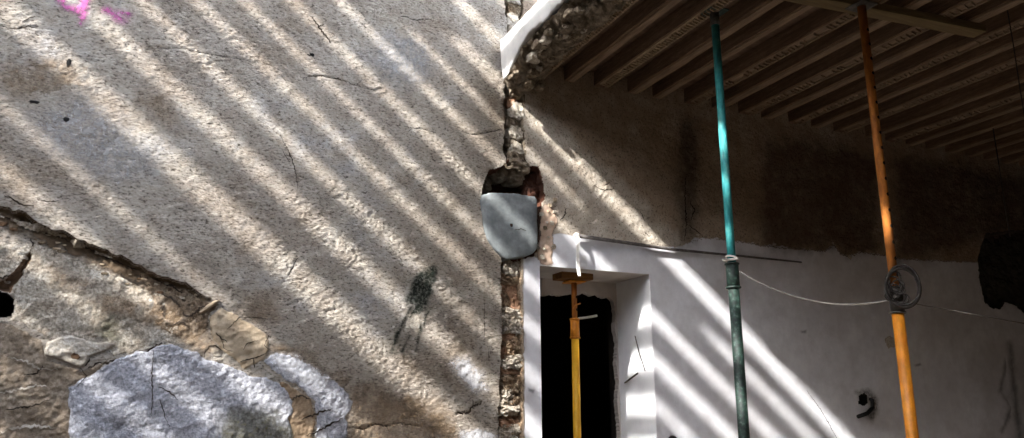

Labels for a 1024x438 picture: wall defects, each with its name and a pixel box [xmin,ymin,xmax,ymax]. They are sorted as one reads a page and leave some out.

crack [303,16,382,90]
spalling [977,230,1024,313]
flaking render [0,206,275,438]
leakage [390,306,429,353]